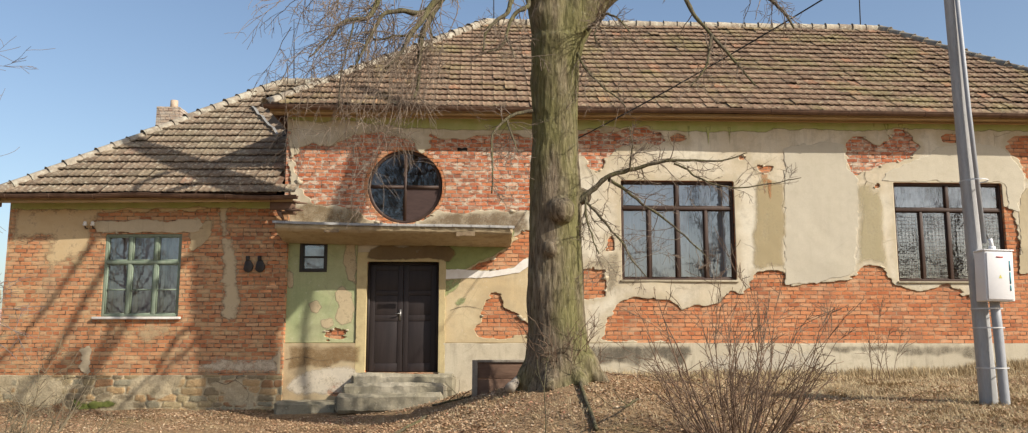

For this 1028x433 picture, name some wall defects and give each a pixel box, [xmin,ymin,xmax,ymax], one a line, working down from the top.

flaking render [285,131,533,224]
flaking render [578,127,686,173]
flaking render [845,128,919,175]
spalling [941,132,956,143]
flaking render [1005,136,1028,179]
flaking render [471,229,529,271]
peeling [309,286,355,341]
flaking render [474,293,528,339]
flaking render [583,267,609,301]
flaking render [601,265,974,343]
flaking render [988,207,1028,343]